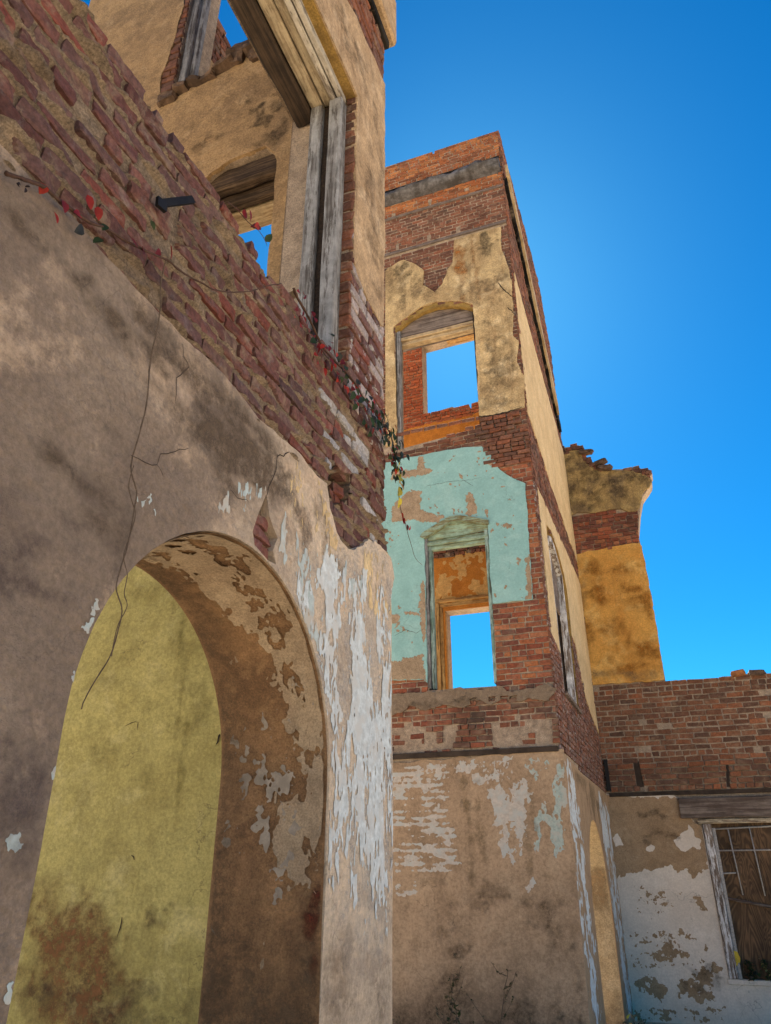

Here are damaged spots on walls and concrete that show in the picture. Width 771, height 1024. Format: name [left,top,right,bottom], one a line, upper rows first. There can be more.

crack [131,448,188,474]
crack [234,452,289,502]
peeling [143,451,601,1024]
peeling [598,792,726,1023]